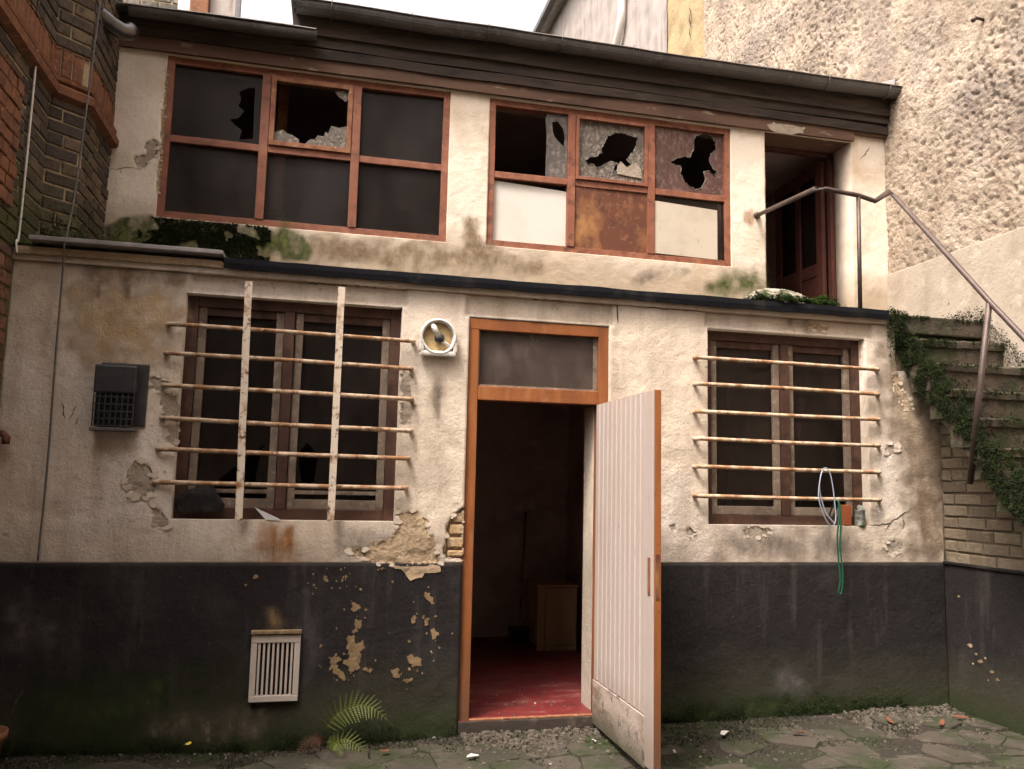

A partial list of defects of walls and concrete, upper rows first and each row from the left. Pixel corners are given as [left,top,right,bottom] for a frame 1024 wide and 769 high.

flaking render [134,70,169,194]
peeling [767,122,805,135]
leakage [105,216,152,244]
leakage [279,218,497,267]
rust [574,186,647,254]
flaking render [148,375,181,446]
spalling [892,373,915,411]
flaking render [149,503,173,530]
rust [261,527,294,554]
flaking render [743,525,773,540]
flaking render [882,540,903,556]
spalling [307,507,465,683]